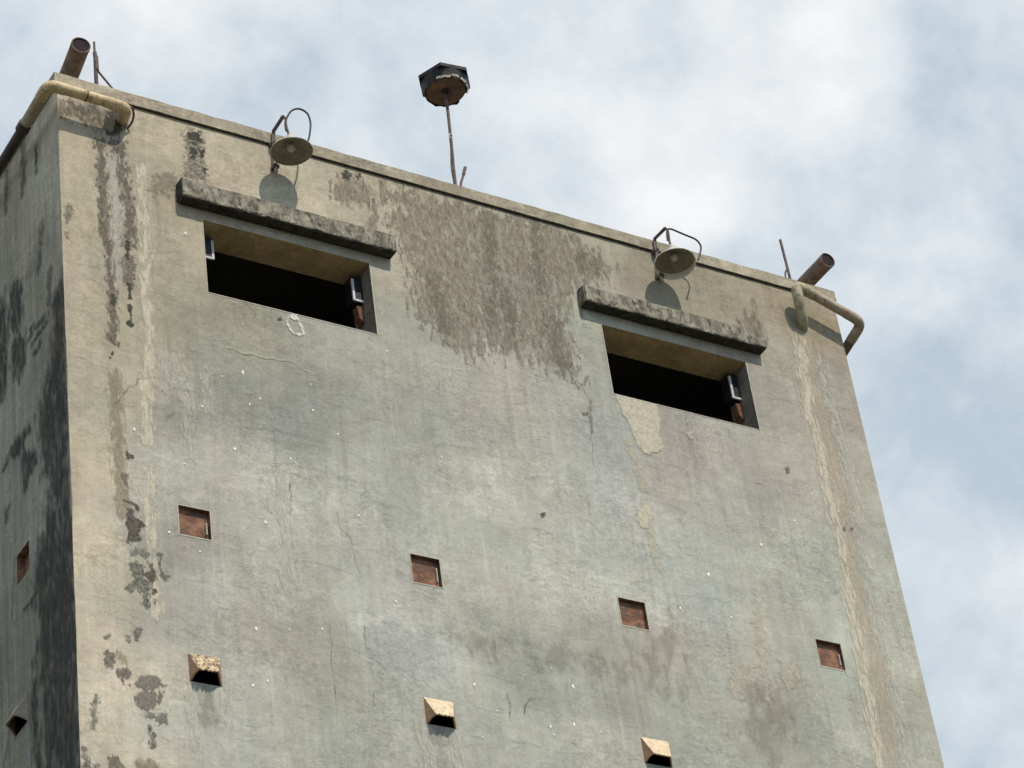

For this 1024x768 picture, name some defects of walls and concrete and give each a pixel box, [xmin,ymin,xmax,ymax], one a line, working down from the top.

damp [0,219,79,768]
damp [59,100,183,621]
damp [329,170,619,390]